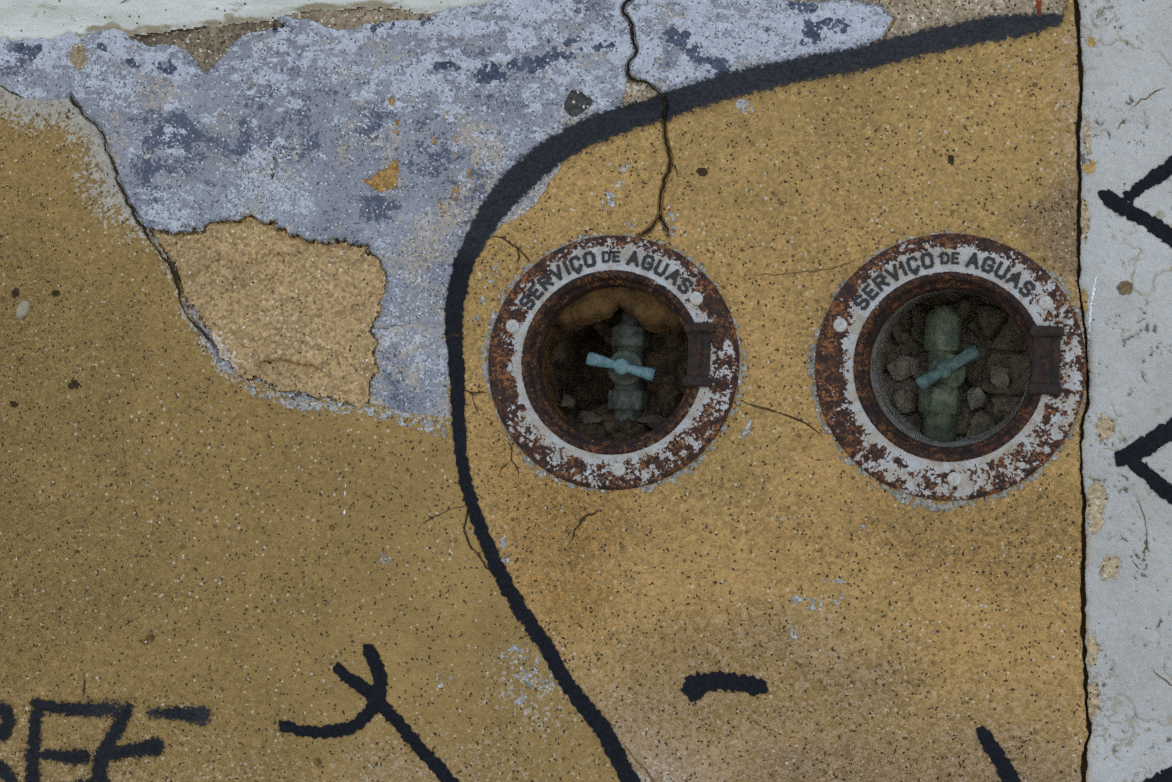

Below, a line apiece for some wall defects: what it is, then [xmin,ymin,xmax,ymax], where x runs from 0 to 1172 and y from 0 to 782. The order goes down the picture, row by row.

crack [70,96,315,345]
peeling [0,0,1067,438]
crack [619,0,678,237]
crack [1117,88,1163,130]
crack [1073,0,1092,782]
crack [1132,500,1148,569]